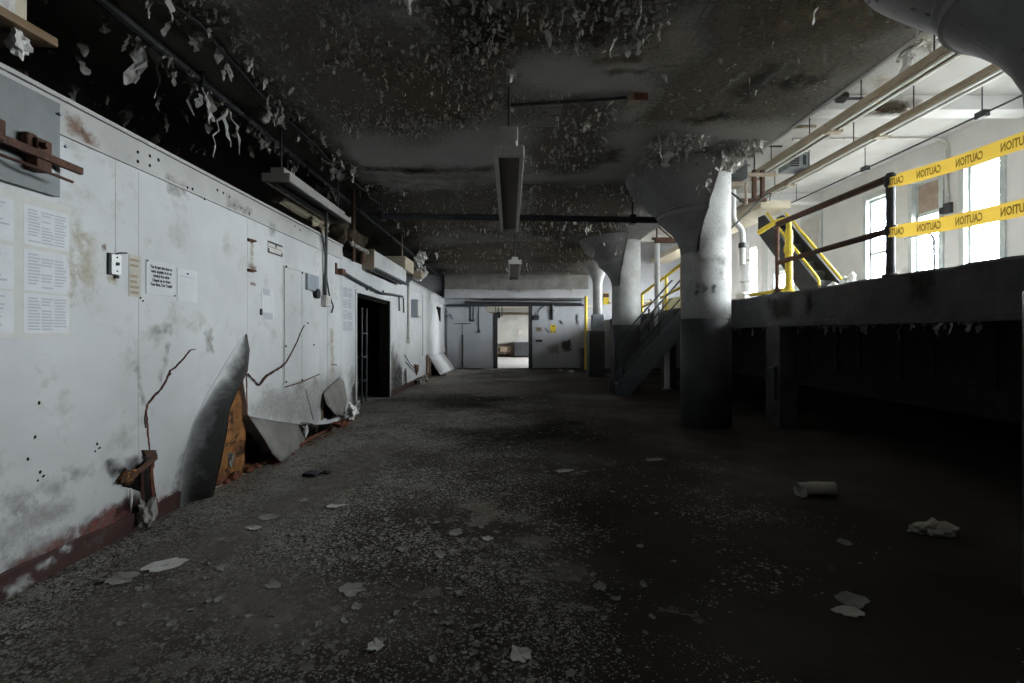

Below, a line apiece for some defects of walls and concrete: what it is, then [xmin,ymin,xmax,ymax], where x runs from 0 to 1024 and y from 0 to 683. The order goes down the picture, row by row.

corrosion [69,120,90,143]
peeling [61,0,909,275]
crack [247,325,305,386]
crack [144,349,195,450]
hole [244,431,260,463]